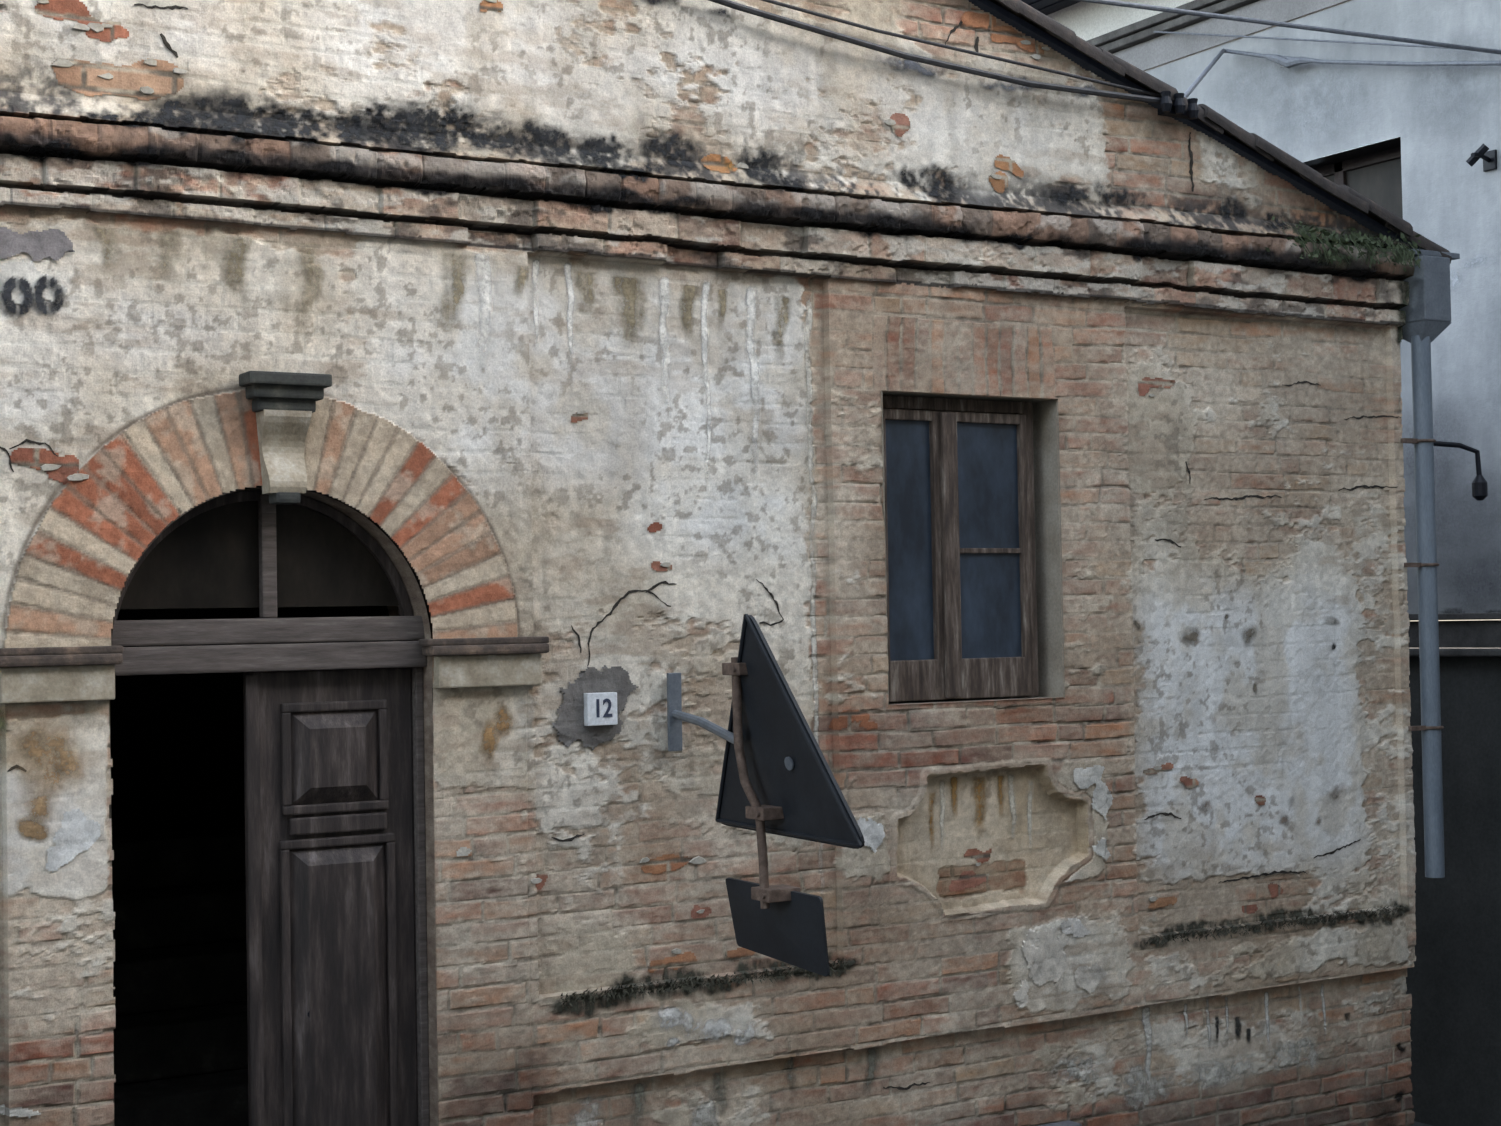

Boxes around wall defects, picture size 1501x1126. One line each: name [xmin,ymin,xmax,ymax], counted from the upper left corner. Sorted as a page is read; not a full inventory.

peeling [961,8,1050,60]
peeling [884,113,911,137]
water stain [3,134,86,164]
water stain [90,97,1101,255]
peeling [989,154,1024,194]
water stain [1049,184,1139,207]
water stain [1122,241,1377,281]
water stain [613,277,726,466]
crack [0,439,58,472]
crack [571,581,676,666]
spalling [1244,628,1255,643]
peeling [1143,763,1199,789]